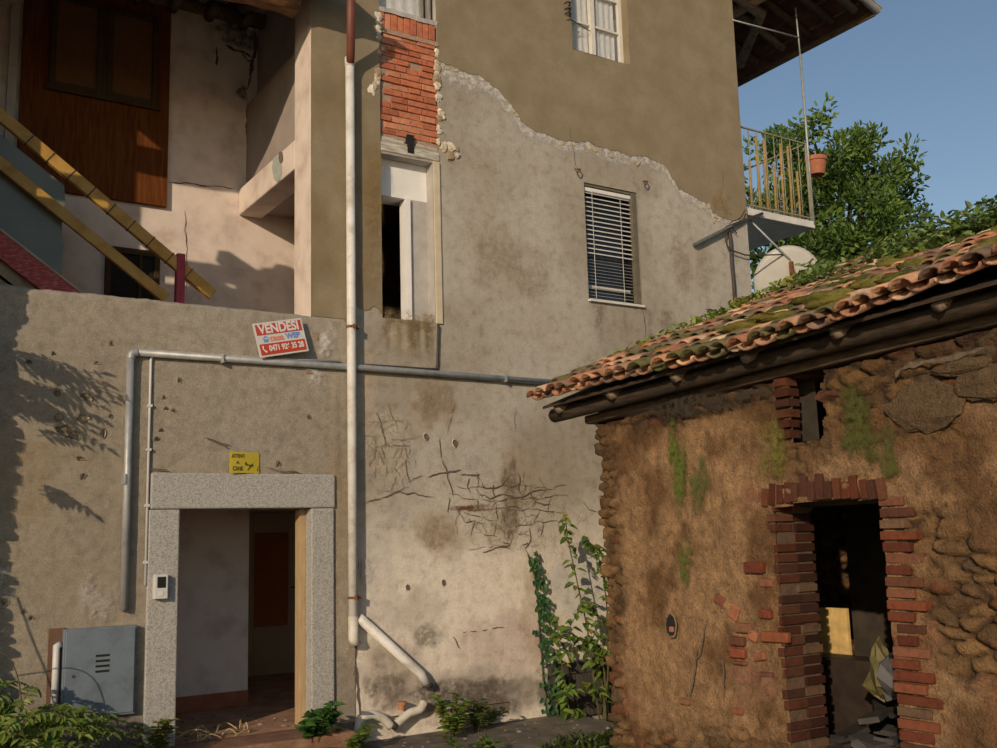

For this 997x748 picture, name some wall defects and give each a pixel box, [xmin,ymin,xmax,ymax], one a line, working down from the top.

crack [215,28,258,140]
spalling [367,6,745,225]
crack [167,181,233,189]
crack [362,404,604,553]
leakage [627,388,767,511]
spalling [743,562,774,587]
spalling [714,593,791,677]
leakage [418,679,510,723]